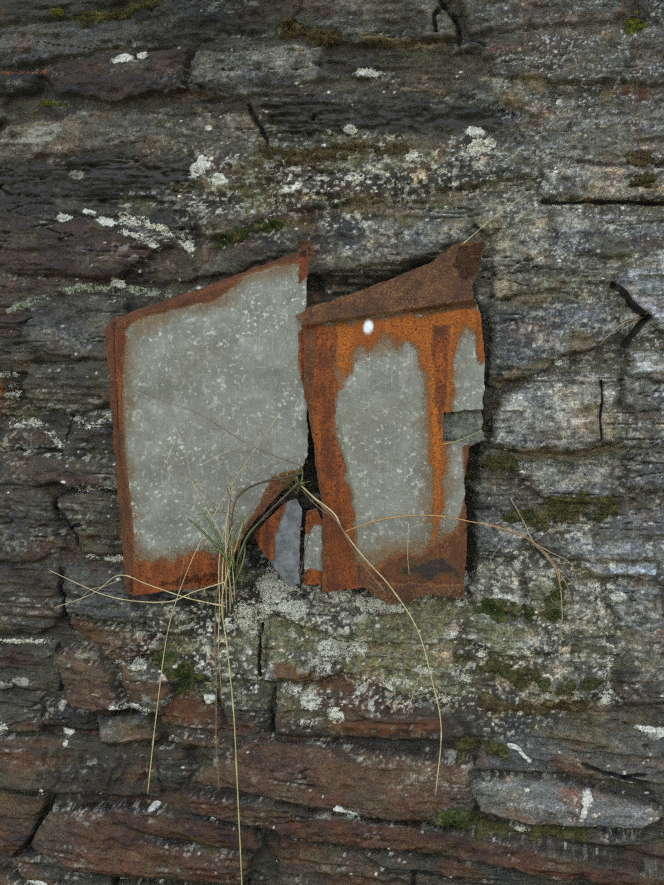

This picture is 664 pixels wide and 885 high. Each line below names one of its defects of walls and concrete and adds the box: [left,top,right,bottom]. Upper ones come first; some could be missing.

rust [296,241,486,605]